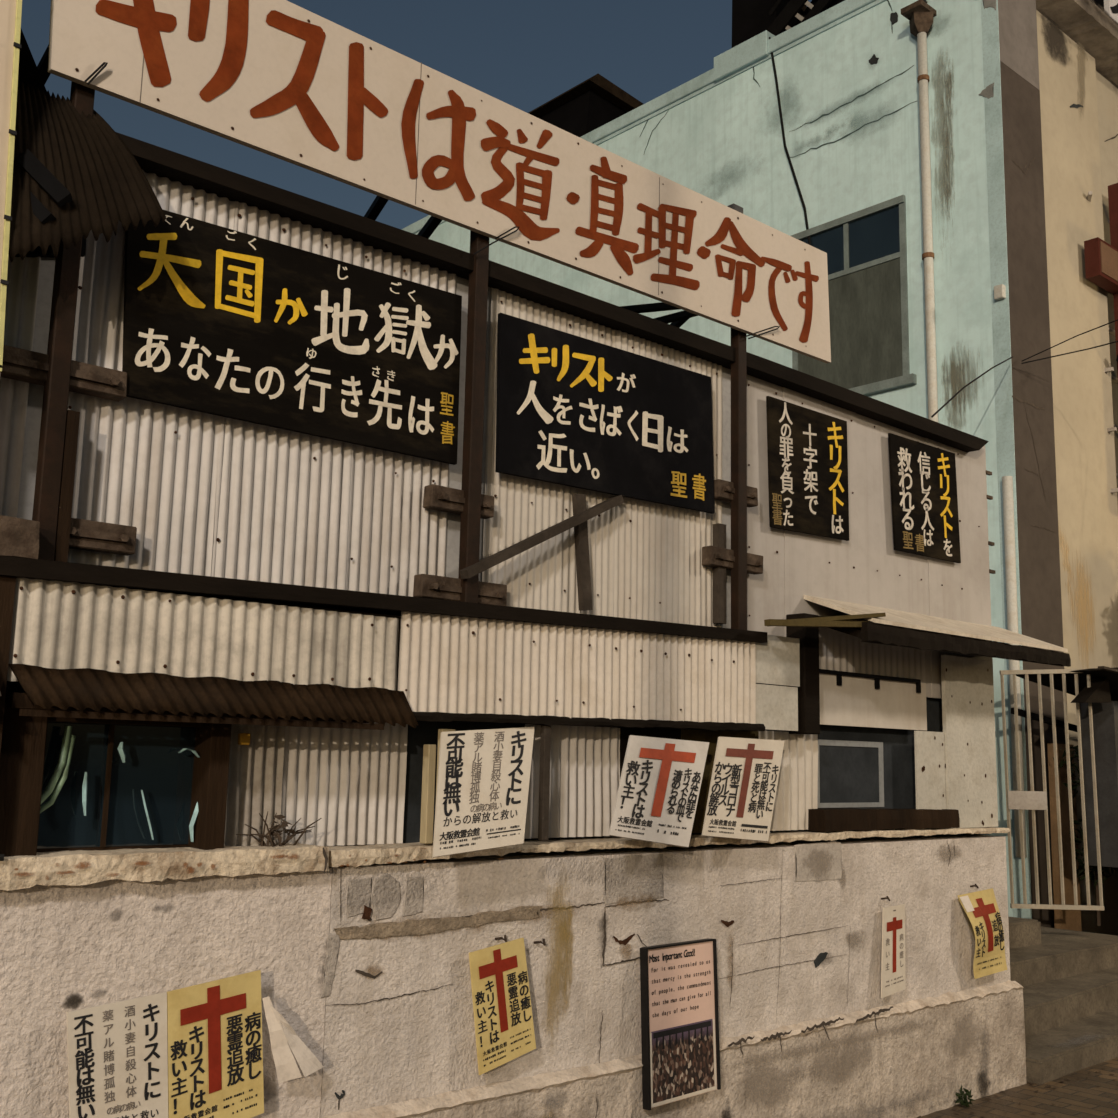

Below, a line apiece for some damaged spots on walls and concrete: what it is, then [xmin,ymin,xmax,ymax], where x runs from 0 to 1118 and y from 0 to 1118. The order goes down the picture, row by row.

peeling [983,0,996,10]
crack [790,65,917,158]
water stain [548,893,572,1019]